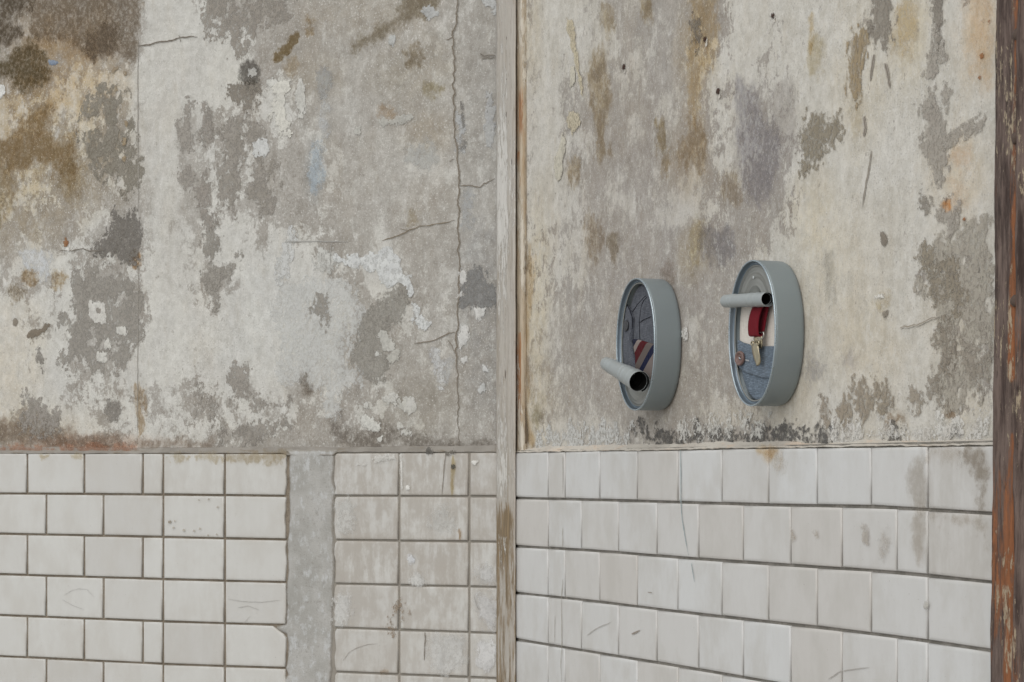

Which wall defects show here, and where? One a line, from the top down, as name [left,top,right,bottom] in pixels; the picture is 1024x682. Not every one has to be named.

crack [138,36,194,46]
peeling [27,65,148,382]
peeling [174,75,307,312]
crack [382,0,495,489]
peeling [797,107,846,181]
peeling [817,0,995,438]
peeling [13,387,62,440]
peeling [103,398,122,423]
peeling [332,246,432,442]
leakage [535,407,990,463]